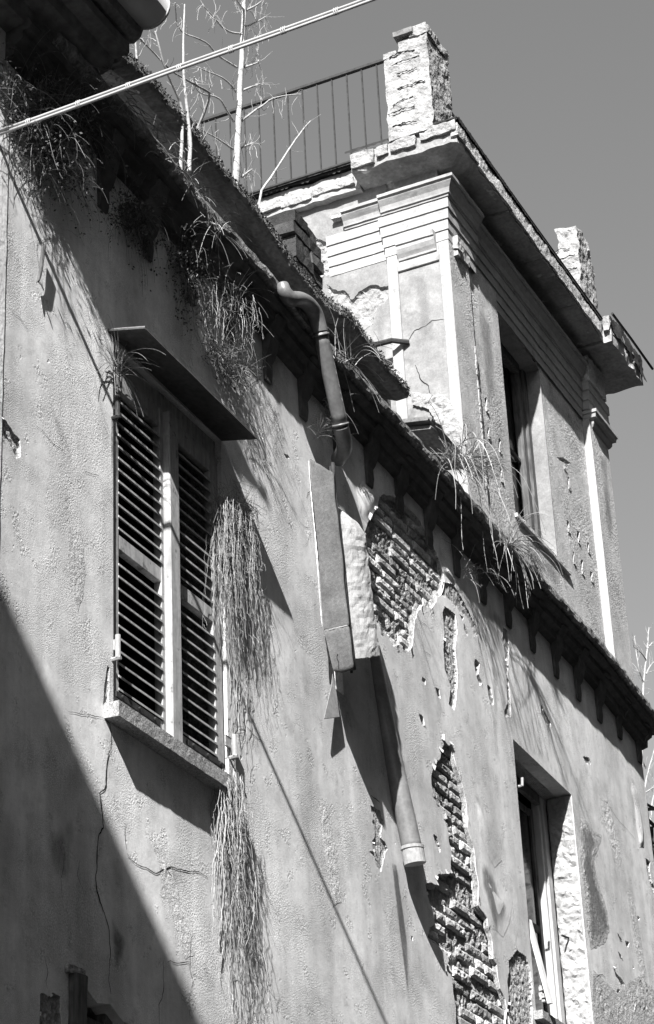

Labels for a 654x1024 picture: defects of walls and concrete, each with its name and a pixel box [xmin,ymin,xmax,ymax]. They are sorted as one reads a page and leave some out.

flaking render [316,238,389,325]
flaking render [362,490,479,710]
crack [61,711,208,992]
crack [159,930,202,1024]
flaking render [370,805,387,872]
flaking render [425,733,532,1024]